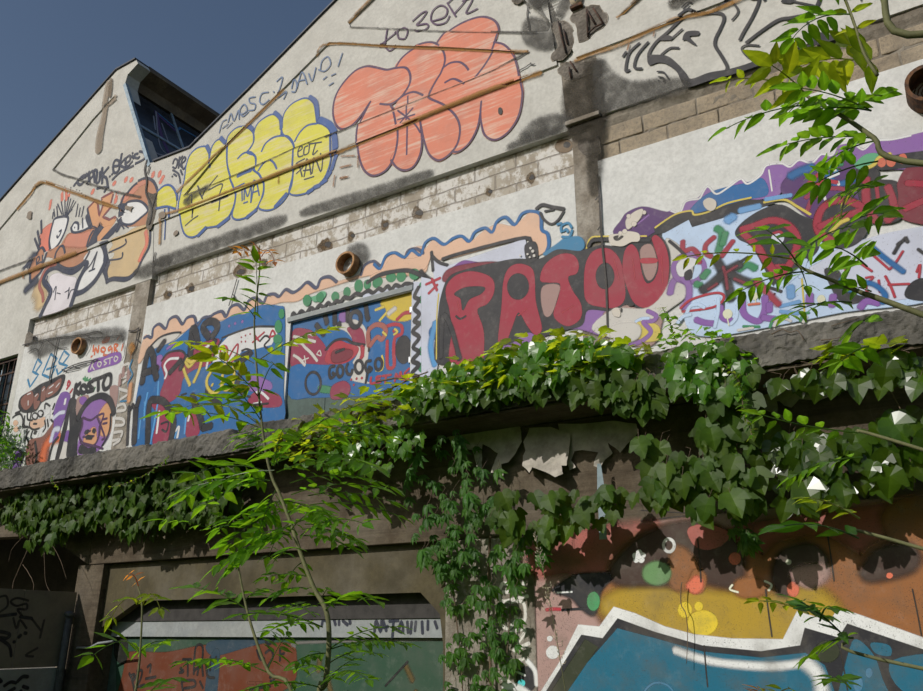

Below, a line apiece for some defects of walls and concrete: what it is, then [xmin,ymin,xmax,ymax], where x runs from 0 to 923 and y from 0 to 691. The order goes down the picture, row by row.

leakage [183,0,570,205]
leakage [507,56,690,195]
leakage [299,169,432,215]
leakage [134,215,286,278]
peeling [448,421,638,477]